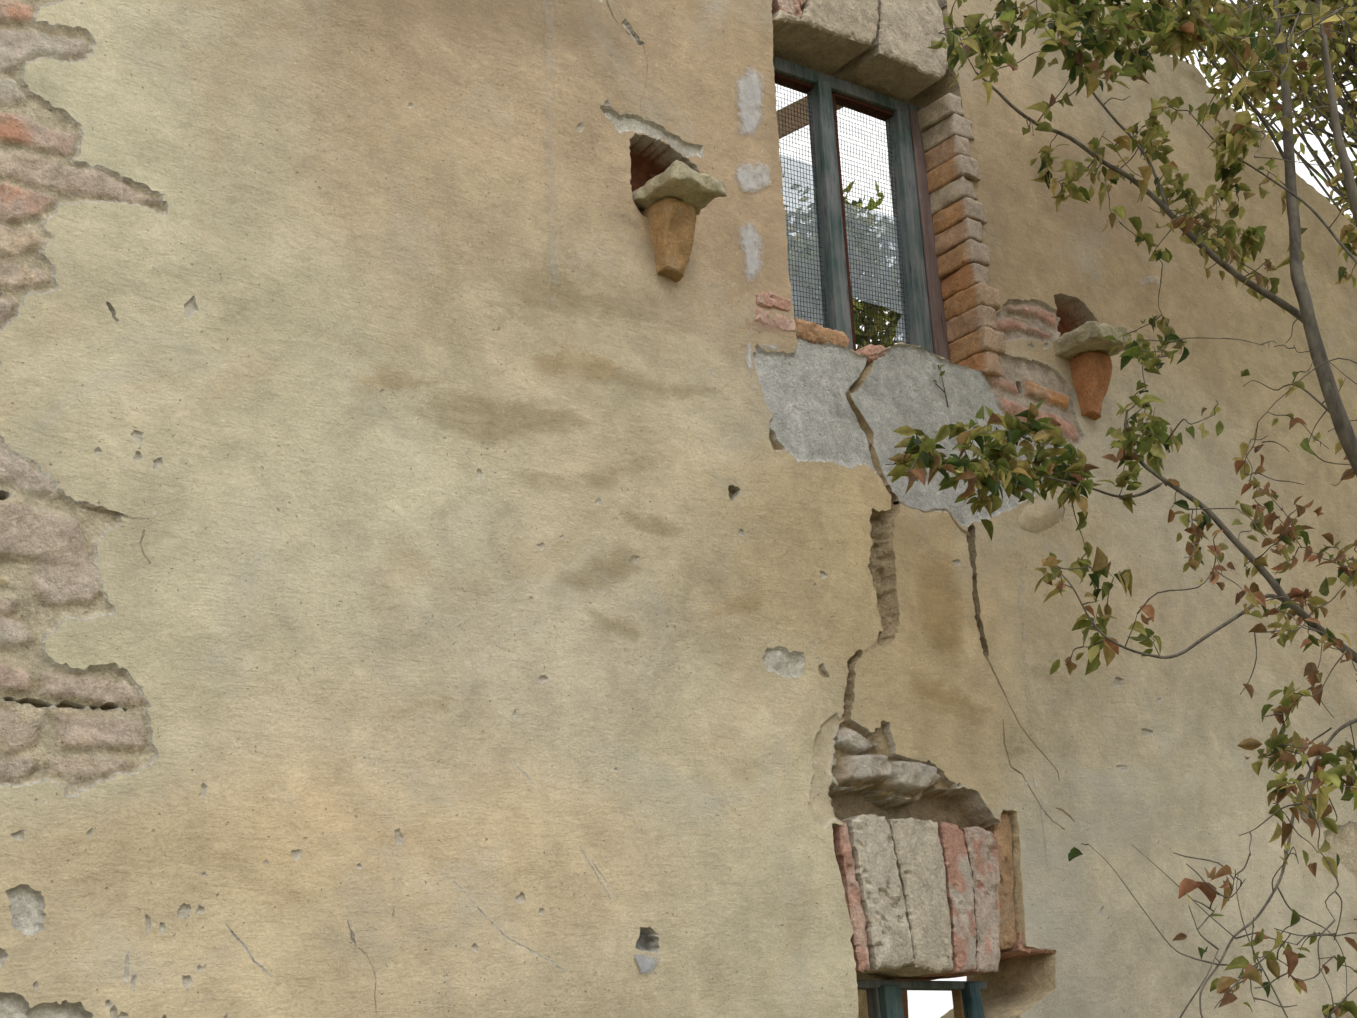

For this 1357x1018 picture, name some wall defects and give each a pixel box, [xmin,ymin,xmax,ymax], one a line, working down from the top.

flaking render [0,0,168,332]
flaking render [184,295,199,319]
flaking render [982,299,1084,450]
flaking render [130,430,163,470]
flaking render [769,429,787,452]
flaking render [0,435,160,798]
crack [838,354,1075,830]
spalling [808,712,1001,830]
flaking render [6,884,46,936]
flaking render [145,902,205,936]
flaking render [0,948,9,968]
flaking render [0,981,129,1018]